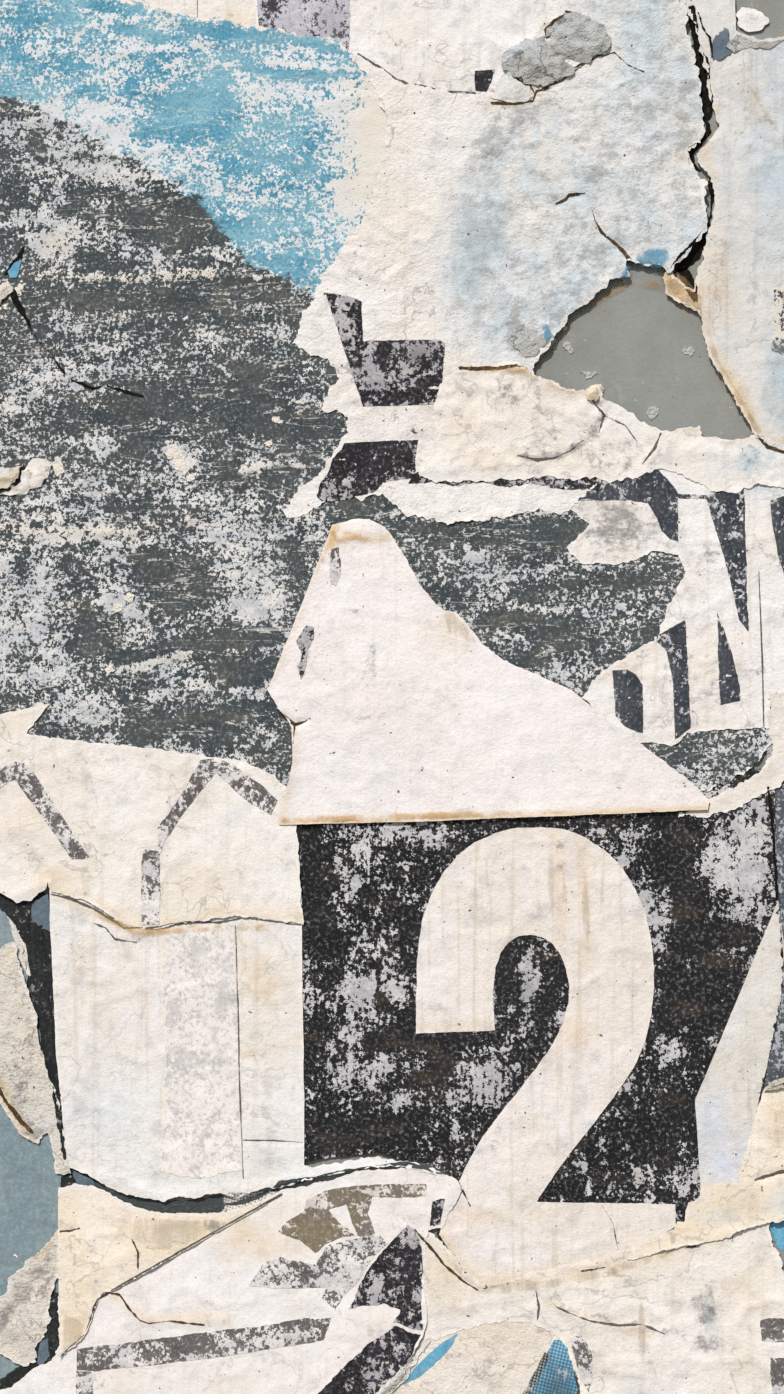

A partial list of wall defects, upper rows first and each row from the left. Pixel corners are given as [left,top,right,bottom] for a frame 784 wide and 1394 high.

peeling [710,7,784,60]
crack [671,0,714,302]
crack [4,246,144,397]
peeling [663,268,701,314]